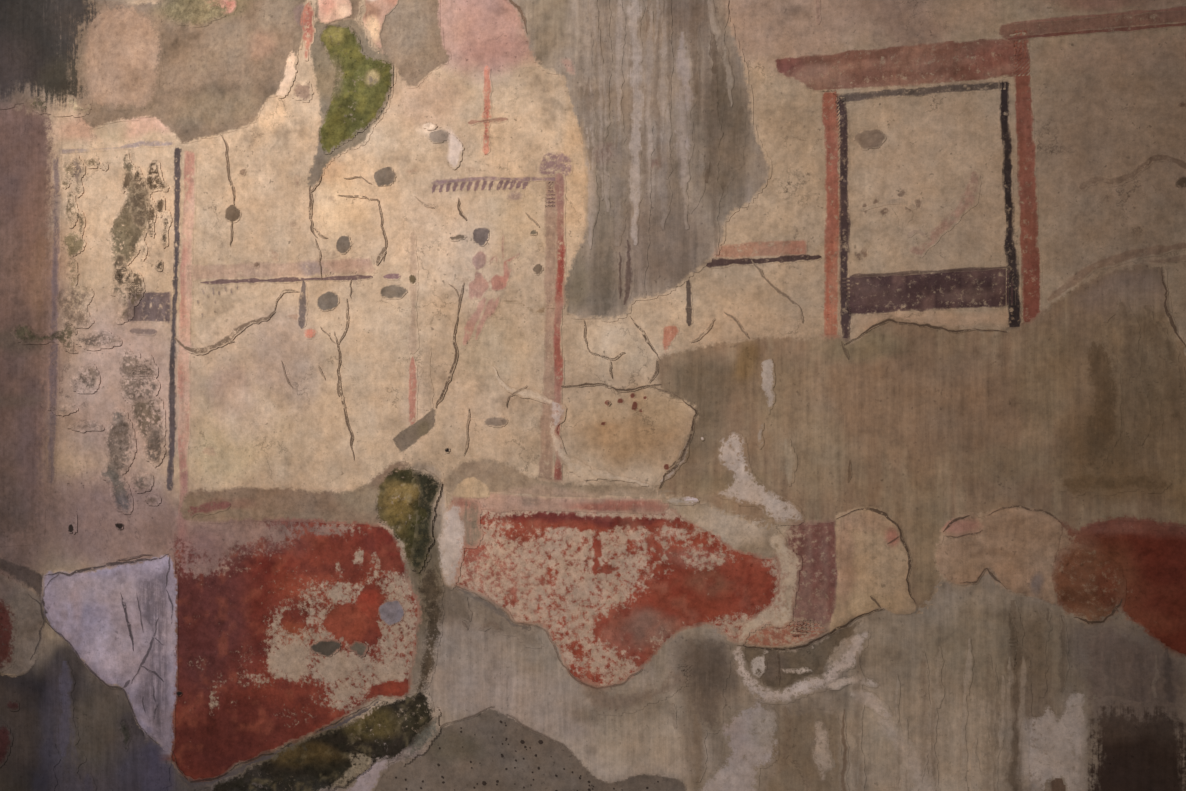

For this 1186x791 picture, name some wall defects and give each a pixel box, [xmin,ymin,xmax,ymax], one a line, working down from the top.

damp [0,0,107,117]
flaking render [305,18,397,190]
damp [576,0,749,314]
crack [174,173,387,355]
crack [318,279,354,458]
crack [435,283,470,456]
crack [561,317,698,489]
spalling [167,407,1085,791]
damp [492,358,945,791]
spalling [0,618,145,791]
damp [344,760,389,791]
damp [958,600,1186,791]